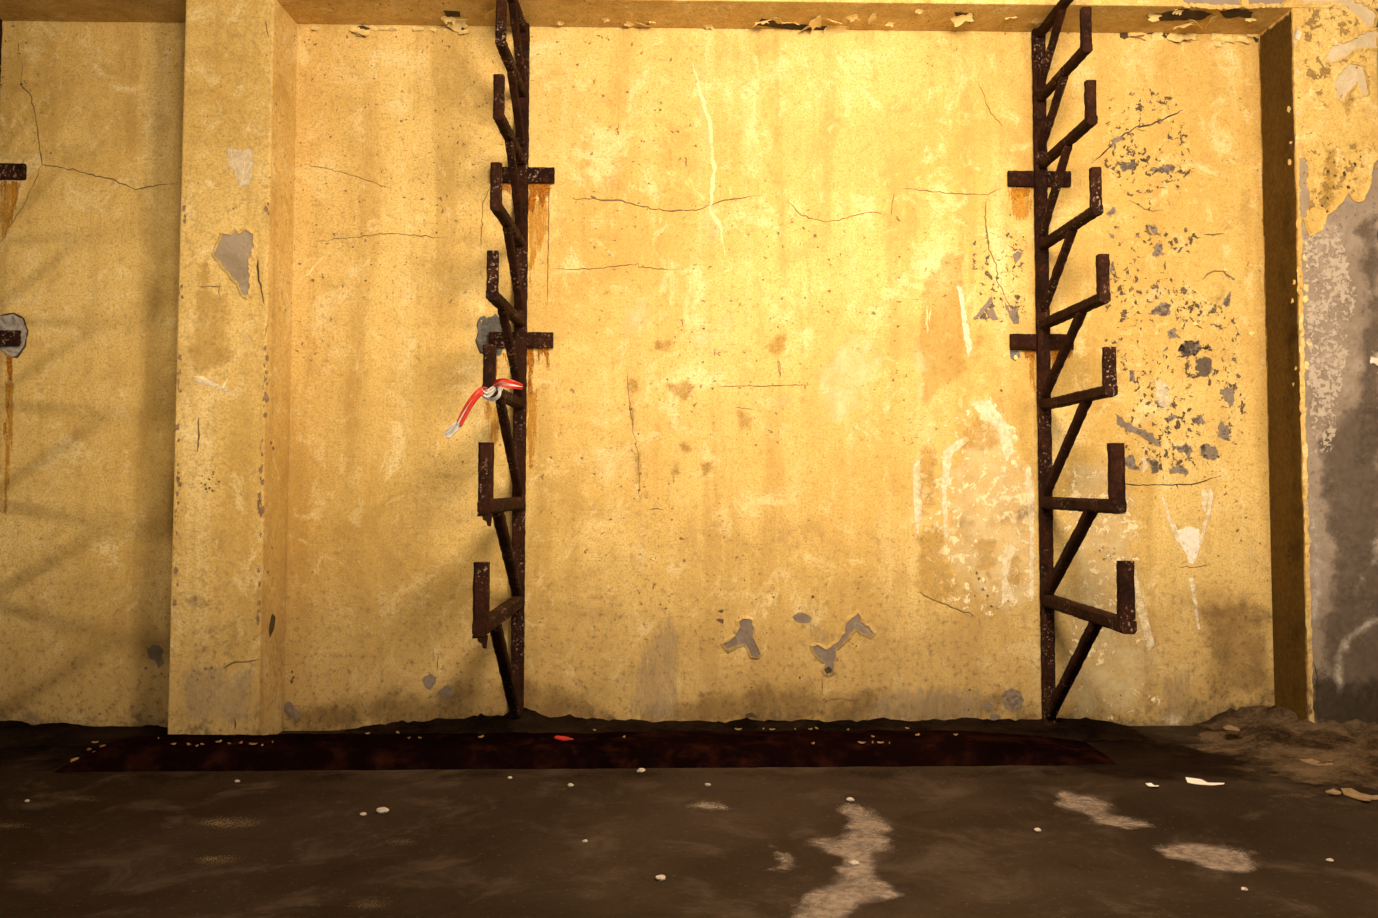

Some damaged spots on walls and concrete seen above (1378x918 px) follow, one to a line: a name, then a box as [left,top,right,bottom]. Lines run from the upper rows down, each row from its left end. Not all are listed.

peeling [1120,0,1378,106]
peeling [211,226,266,307]
rust [528,183,550,303]
crack [556,63,1011,310]
peeling [1104,89,1255,477]
rust [3,351,14,515]
spalling [257,326,275,537]
peeling [1296,110,1378,724]
spalling [256,567,276,637]
peeling [716,610,767,660]
peeling [793,595,814,623]
peeling [799,610,876,710]